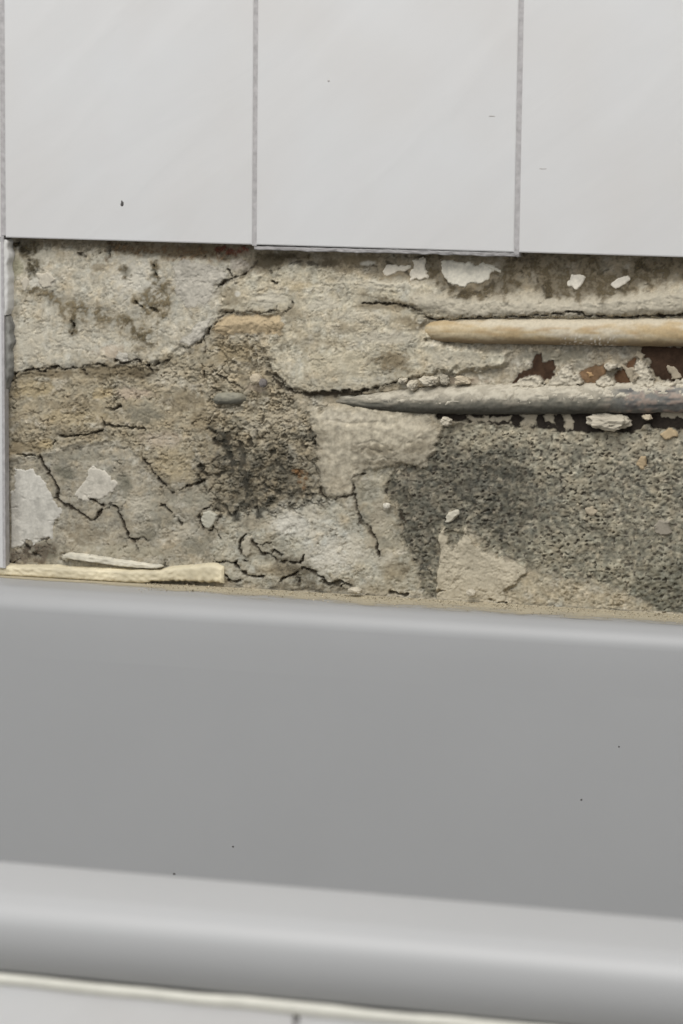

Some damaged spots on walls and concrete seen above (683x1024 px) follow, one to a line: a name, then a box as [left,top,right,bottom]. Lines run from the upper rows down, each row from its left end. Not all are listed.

peeling [383,257,429,281]
peeling [440,259,501,288]
peeling [567,274,586,290]
crack [362,302,683,320]
crack [273,377,396,397]
corrosion [512,353,556,384]
corrosion [579,346,683,383]
leakage [215,430,314,520]
peeling [10,468,62,548]
crack [40,455,146,542]
spalling [383,412,683,612]
crack [217,534,324,582]